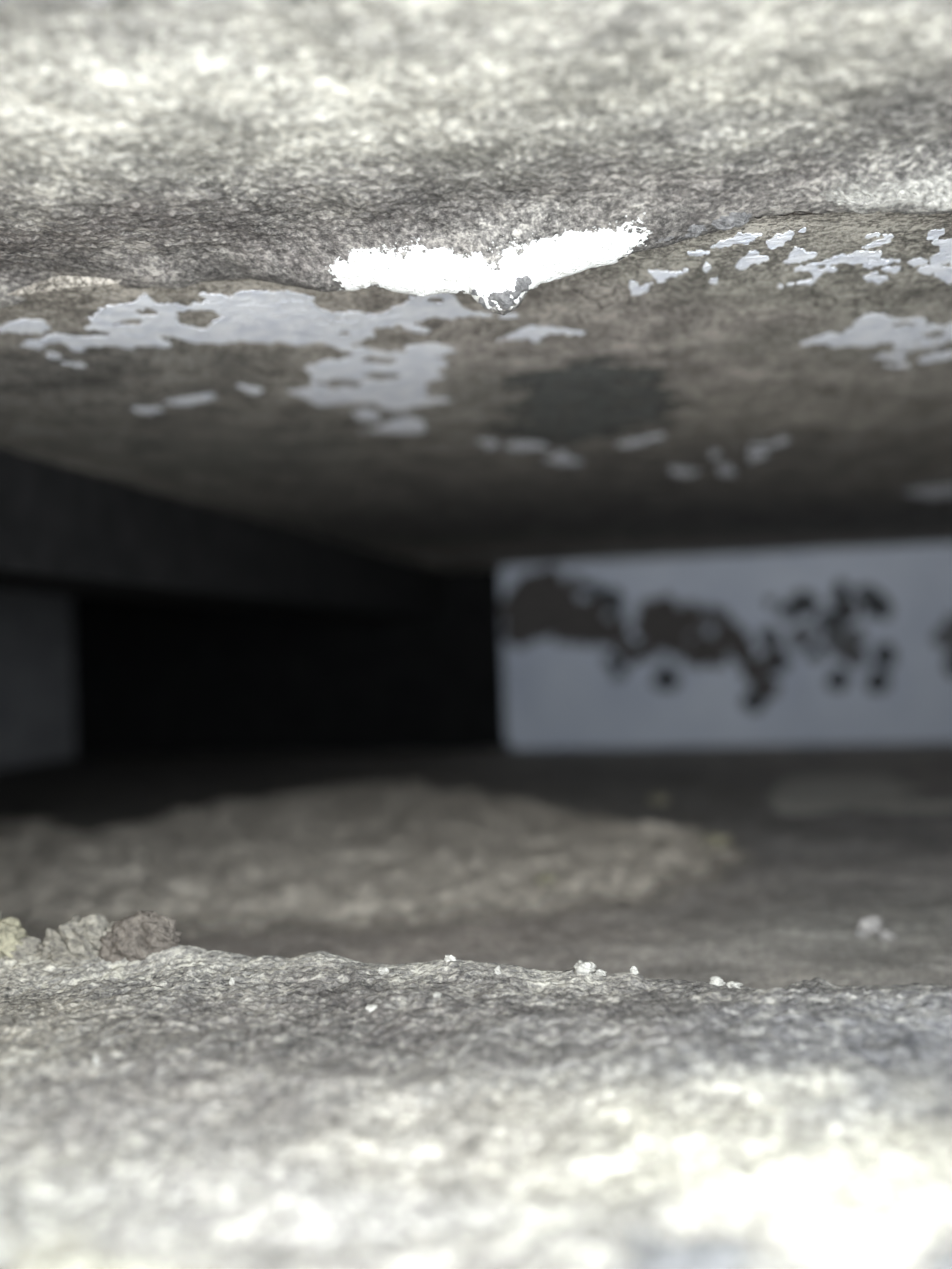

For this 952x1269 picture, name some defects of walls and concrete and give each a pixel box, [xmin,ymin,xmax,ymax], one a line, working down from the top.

peeling [819,162,952,214]
peeling [629,227,952,296]
peeling [0,212,653,433]
peeling [800,313,952,368]
damp [483,357,693,446]